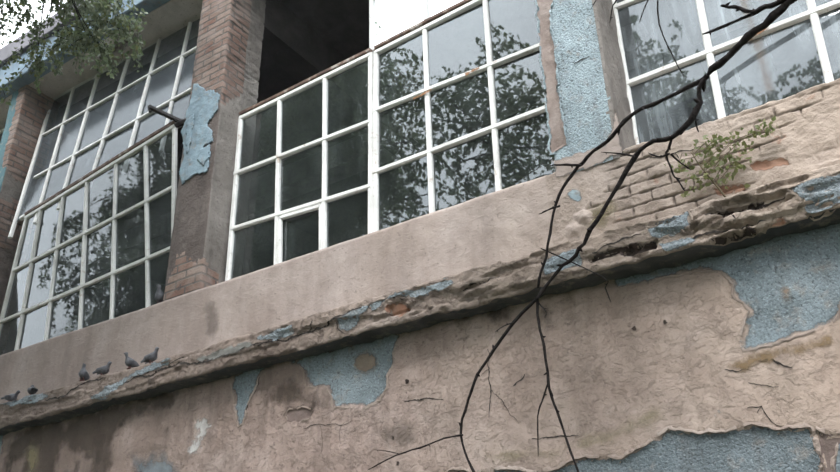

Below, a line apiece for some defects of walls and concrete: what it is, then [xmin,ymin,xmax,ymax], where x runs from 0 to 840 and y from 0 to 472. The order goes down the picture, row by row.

flaking render [535,0,568,155]
peeling [179,83,220,184]
flaking render [750,157,789,171]
flaking render [615,170,840,352]
peeling [337,278,454,331]
damp [6,393,174,472]
flaking render [230,368,265,428]
flaking render [292,334,399,410]
flaking render [494,421,840,472]
crack [725,359,792,387]